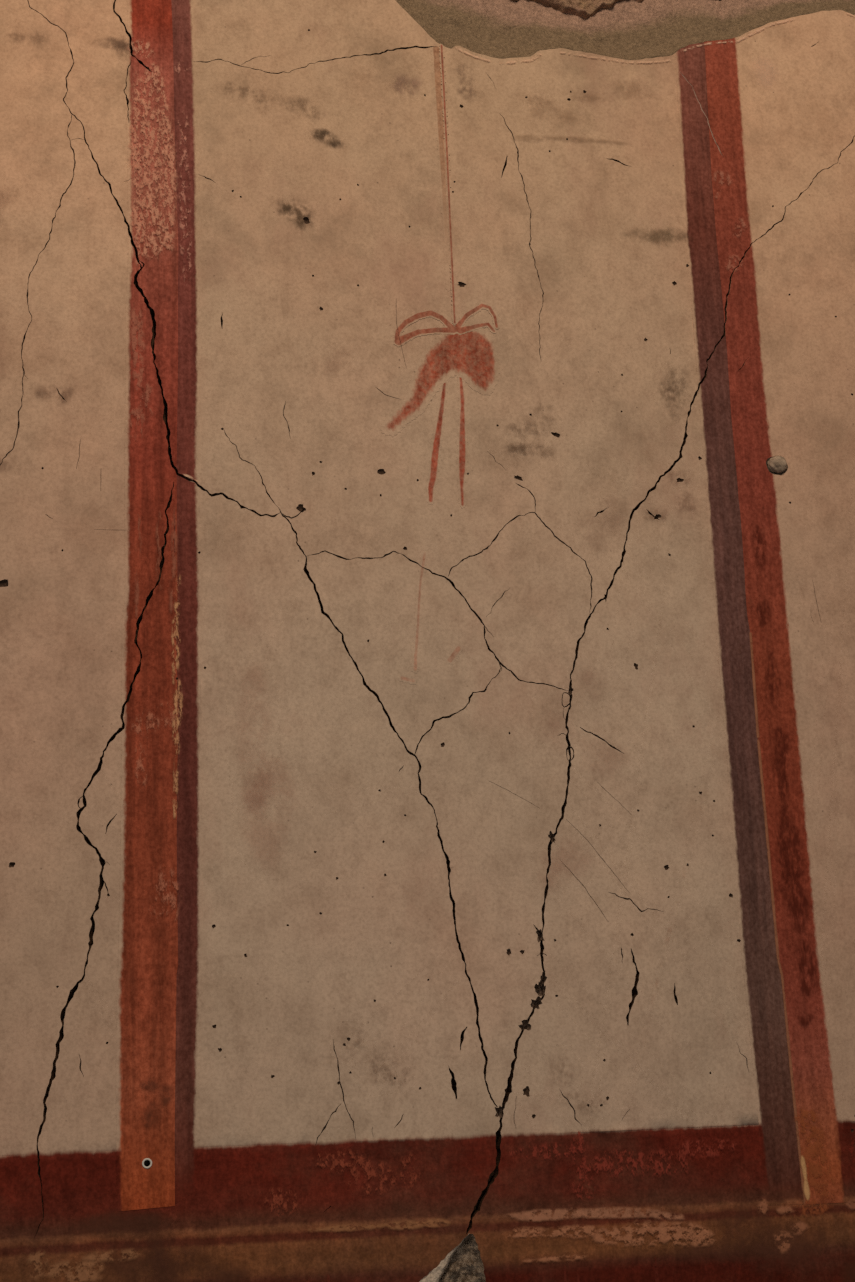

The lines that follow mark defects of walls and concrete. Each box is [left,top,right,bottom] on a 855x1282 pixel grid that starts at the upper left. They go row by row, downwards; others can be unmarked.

crack [197,46,433,74]
flaking render [395,0,855,63]
crack [28,0,279,517]
crack [0,289,32,465]
crack [222,114,854,1234]
crack [35,482,174,1236]
spalling [419,1234,486,1282]